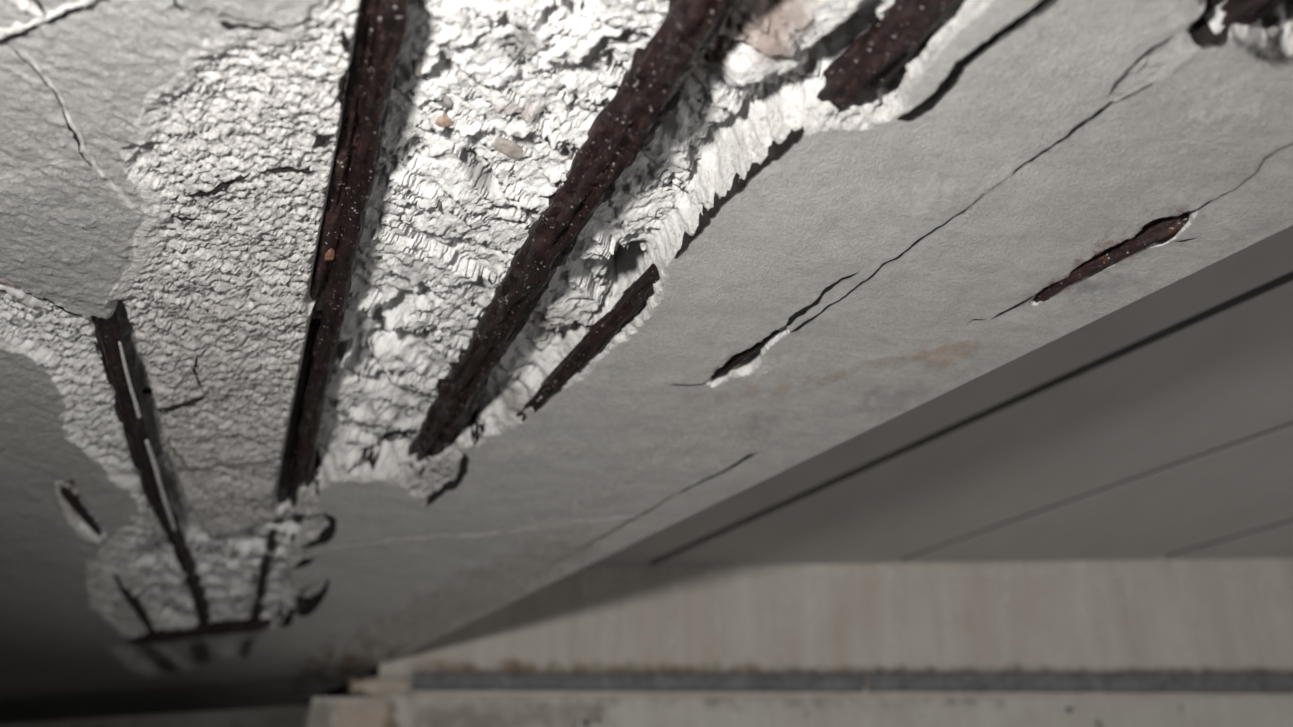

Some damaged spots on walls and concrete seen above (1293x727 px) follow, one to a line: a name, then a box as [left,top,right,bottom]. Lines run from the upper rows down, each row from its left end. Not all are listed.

crack [216,20,287,33]
crack [897,0,1051,121]
crack [5,43,315,221]
crack [785,36,1172,333]
crack [1176,143,1293,242]
rust [1029,210,1198,305]
spalling [0,0,1045,674]